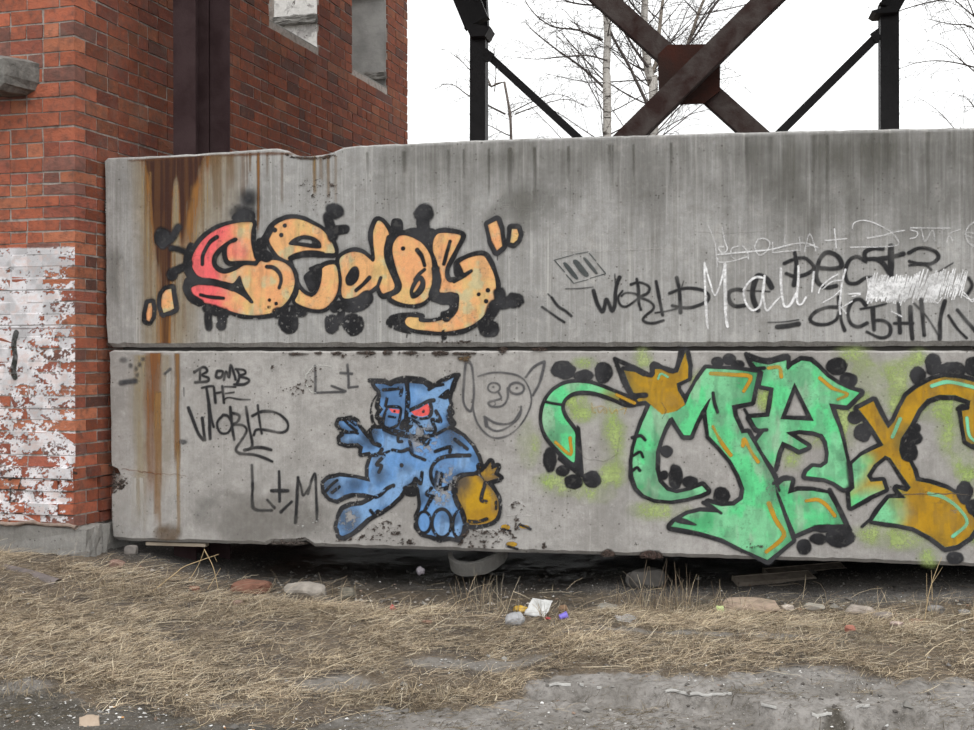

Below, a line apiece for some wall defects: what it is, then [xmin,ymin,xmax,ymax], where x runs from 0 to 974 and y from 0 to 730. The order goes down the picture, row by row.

peeling [0,246,76,523]
corrosion [137,152,291,501]